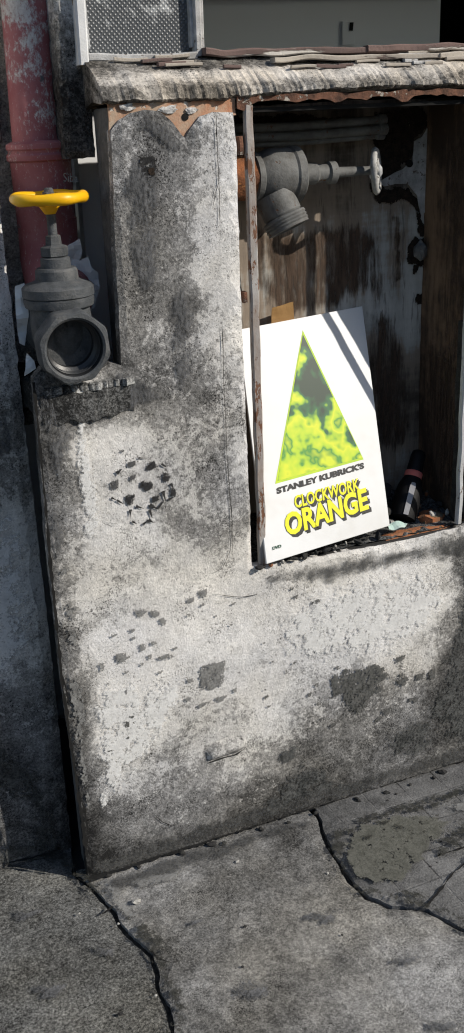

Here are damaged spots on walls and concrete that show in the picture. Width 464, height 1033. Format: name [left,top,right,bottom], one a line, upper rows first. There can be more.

water stain [126,160,157,289]
crack [214,331,257,597]
water stain [268,539,464,582]
water stain [0,594,464,1033]
crack [4,382,464,1033]